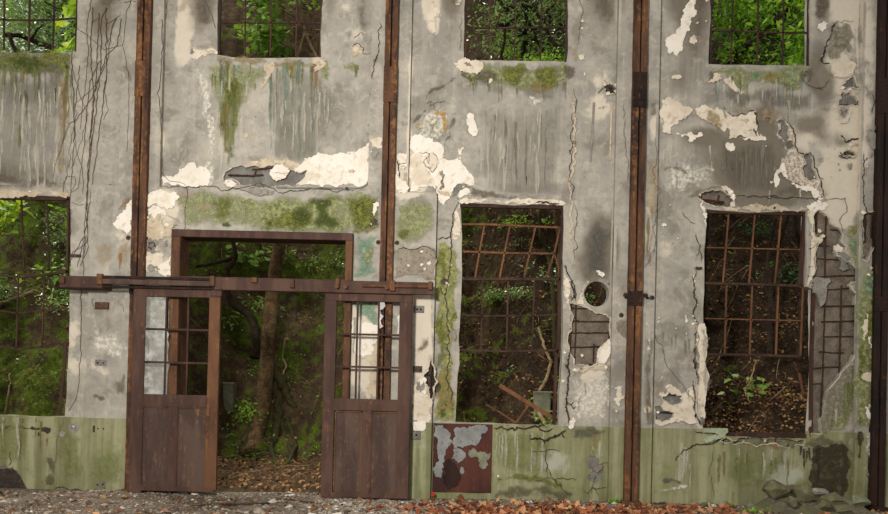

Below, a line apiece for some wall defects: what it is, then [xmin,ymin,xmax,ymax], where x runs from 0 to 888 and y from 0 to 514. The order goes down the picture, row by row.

damp [2,65,72,120]
peeling [146,162,211,277]
damp [197,61,328,185]
peeling [222,137,382,189]
peeling [395,132,566,240]
crack [536,88,578,301]
spalling [563,275,611,373]
crack [675,212,734,499]
spalling [697,118,876,435]
corrosion [443,458,461,490]
crack [494,349,606,495]
damp [800,414,870,496]